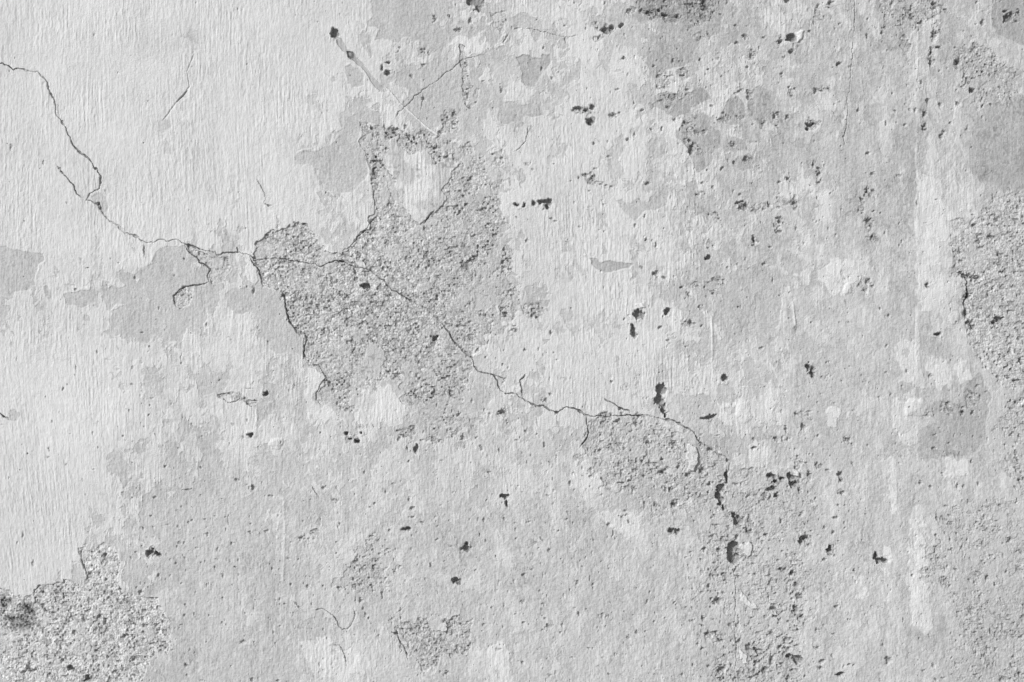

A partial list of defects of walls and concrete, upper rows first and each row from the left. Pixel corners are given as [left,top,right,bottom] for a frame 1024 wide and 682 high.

crack [395,27,580,119]
spalling [762,0,835,59]
flaking render [62,0,568,463]
crack [0,62,731,484]
spalling [806,158,832,195]
spalling [857,277,875,292]
flaking render [866,0,1024,682]
flaking render [0,540,187,682]